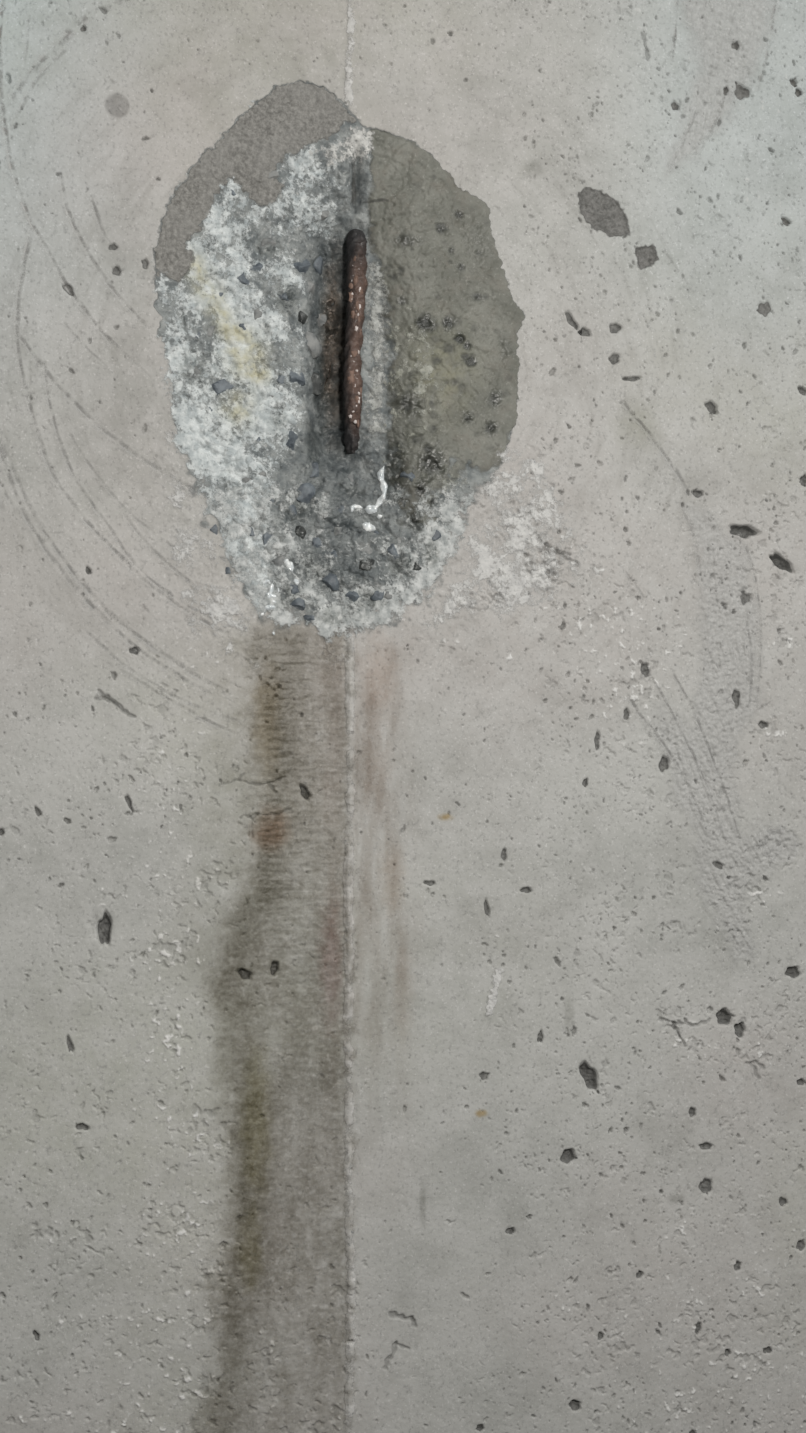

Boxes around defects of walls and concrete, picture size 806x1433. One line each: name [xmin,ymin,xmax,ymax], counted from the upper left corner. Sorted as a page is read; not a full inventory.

corrosion [347,256,363,403]
spalling [153,80,587,668]